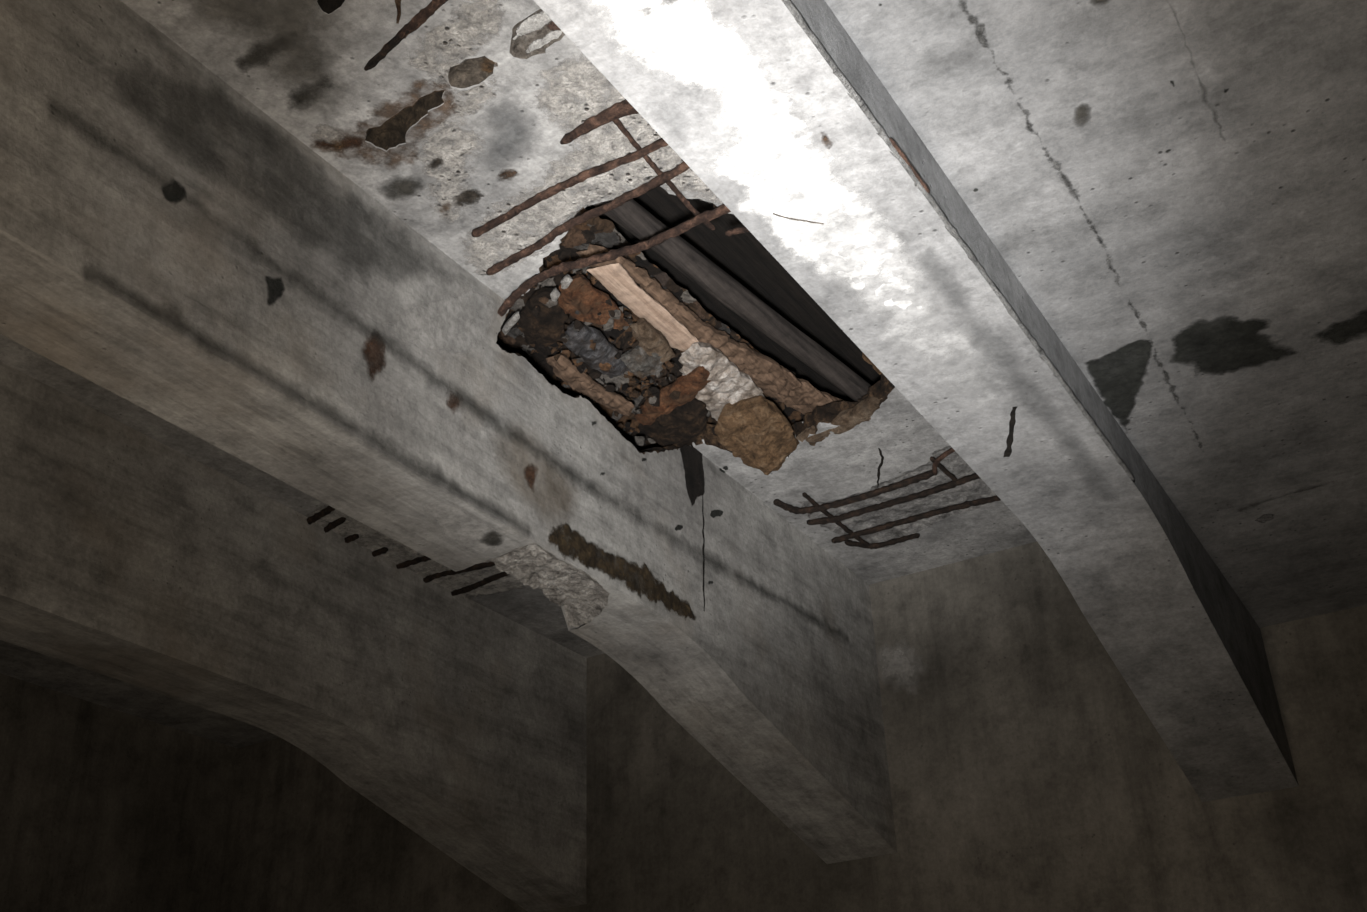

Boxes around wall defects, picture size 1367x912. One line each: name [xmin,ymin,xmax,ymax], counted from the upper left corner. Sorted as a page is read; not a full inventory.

peeling [313,0,994,407]
spalling [638,423,733,473]
spalling [788,352,895,457]
crack [1004,407,1017,457]
damp [1086,340,1152,426]
damp [1173,316,1295,375]
damp [1317,310,1367,345]
spalling [306,503,610,627]
corrosion [549,523,696,620]